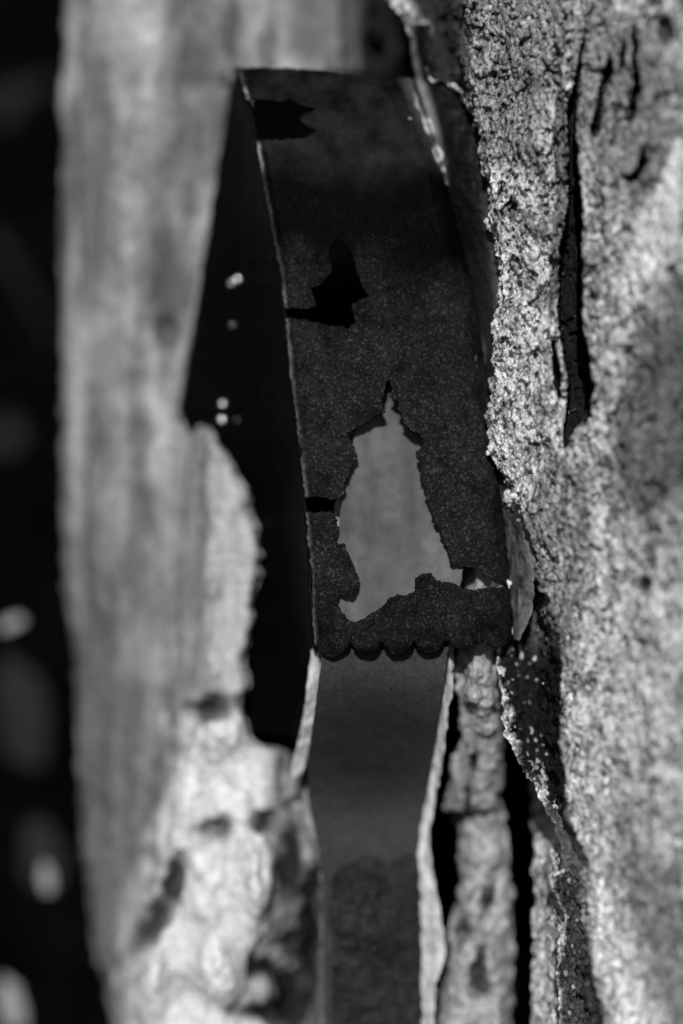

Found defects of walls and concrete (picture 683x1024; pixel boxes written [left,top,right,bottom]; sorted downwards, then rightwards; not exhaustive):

crack [549,20,648,448]
peeling [334,496,343,526]
peeling [290,646,322,787]
peeling [417,643,454,1024]
spalling [498,601,606,1024]